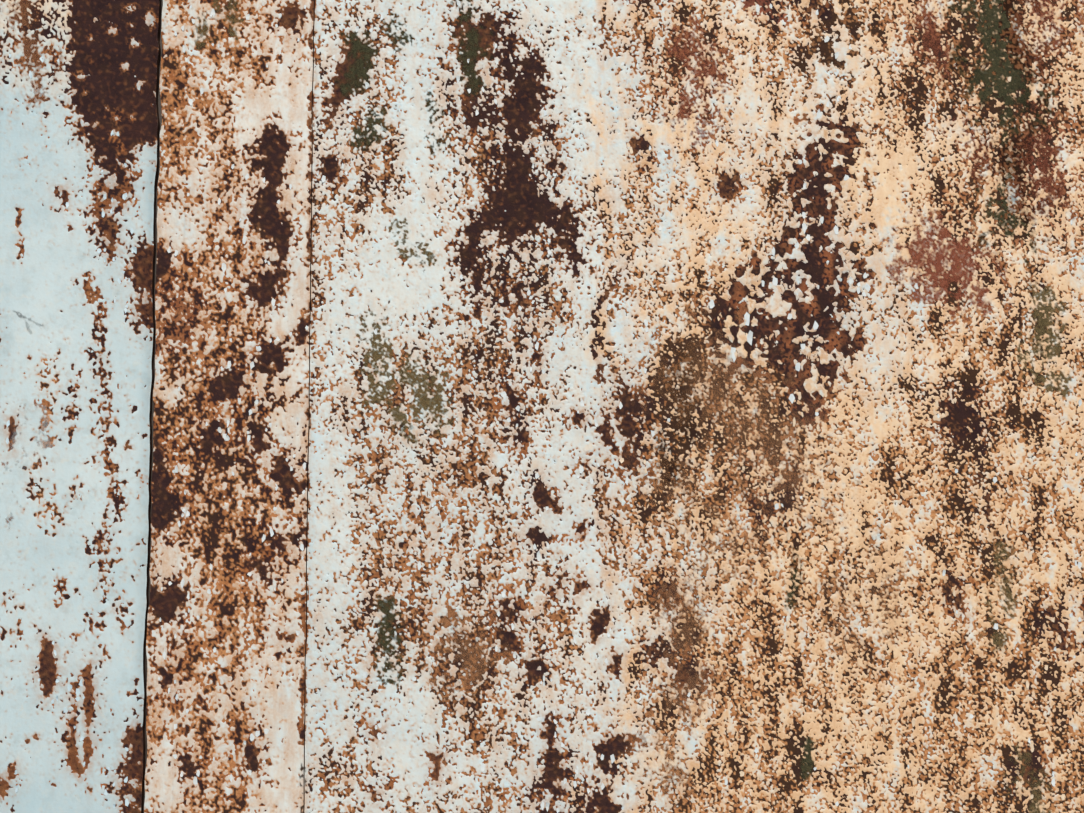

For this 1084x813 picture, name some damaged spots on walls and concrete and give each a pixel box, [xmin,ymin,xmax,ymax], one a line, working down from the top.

corrosion [305,0,317,59]
corrosion [664,17,727,150]
corrosion [734,0,790,30]
corrosion [302,91,400,323]
corrosion [143,269,225,373]
corrosion [883,211,1006,324]
peeling [22,349,65,537]
corrosion [0,271,150,800]
corrosion [970,440,999,543]
corrosion [296,572,309,746]
corrosion [0,761,23,813]
peeling [399,788,419,813]